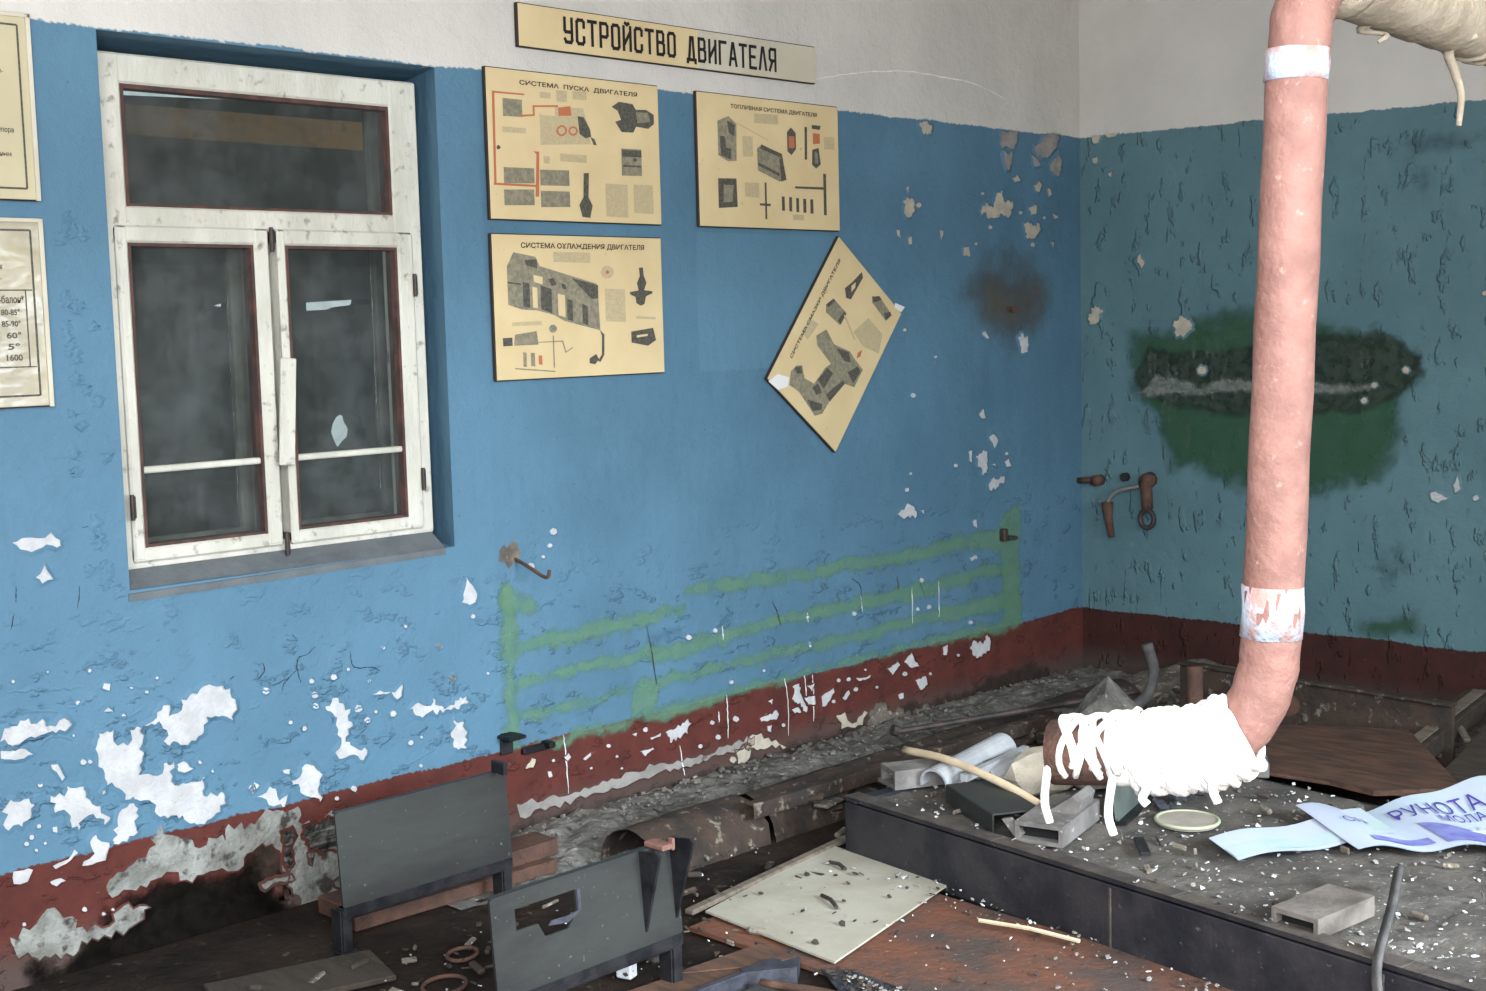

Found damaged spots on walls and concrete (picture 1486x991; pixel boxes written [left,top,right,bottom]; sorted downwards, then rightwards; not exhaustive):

peeling [916,118,934,138]
peeling [895,184,922,246]
peeling [961,126,1063,259]
peeling [1170,313,1196,340]
peeling [1196,363,1209,376]
peeling [1359,381,1379,405]
peeling [6,527,65,587]
peeling [941,618,992,662]
peeling [515,649,964,820]
peeling [0,666,472,962]